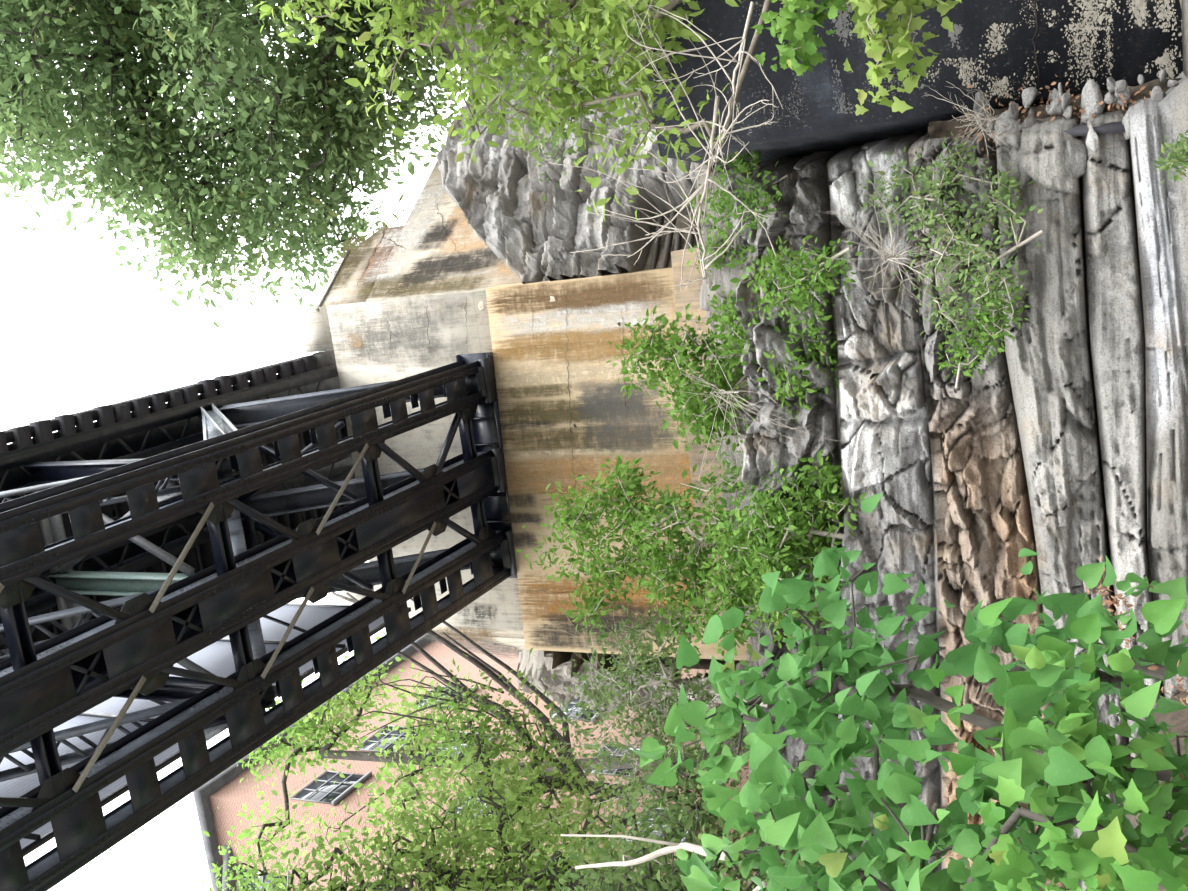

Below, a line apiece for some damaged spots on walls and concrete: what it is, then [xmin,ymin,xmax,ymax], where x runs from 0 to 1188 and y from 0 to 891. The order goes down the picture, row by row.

peeling [830,0,1182,114]
leakage [326,189,497,298]
leakage [491,276,661,337]
leakage [498,355,668,462]
leakage [503,496,540,546]